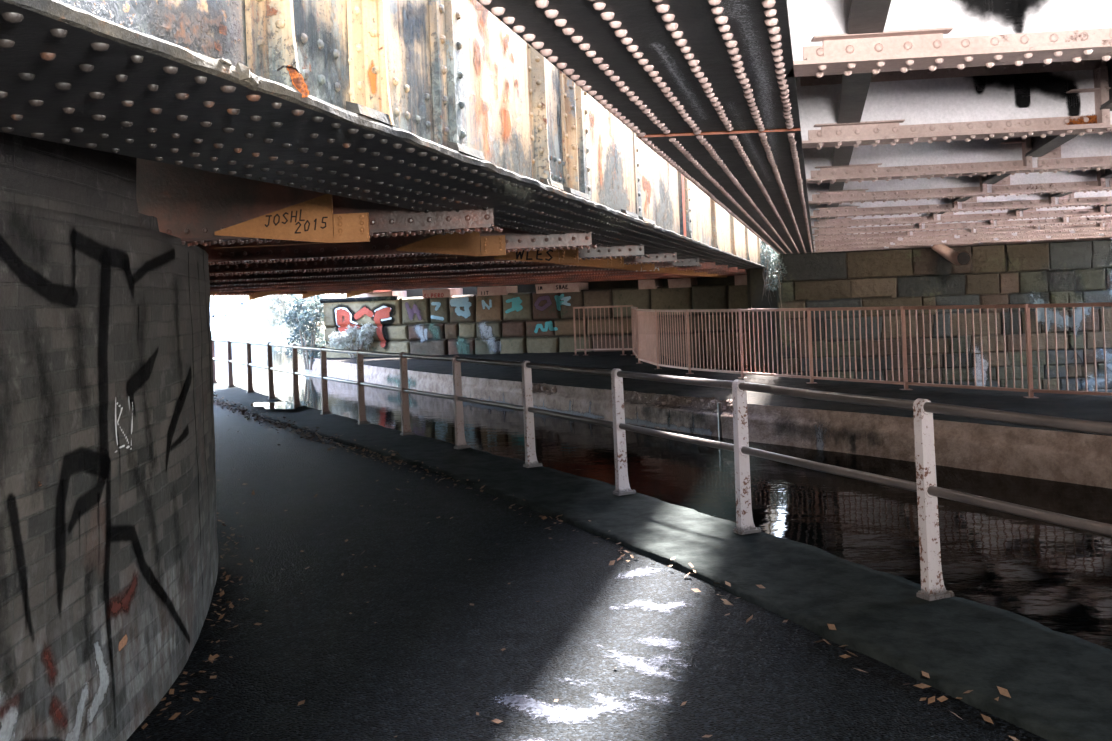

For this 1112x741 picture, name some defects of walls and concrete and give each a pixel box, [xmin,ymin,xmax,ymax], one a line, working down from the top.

rust [287,65,309,98]
rust [470,0,518,154]
rust [589,110,611,186]